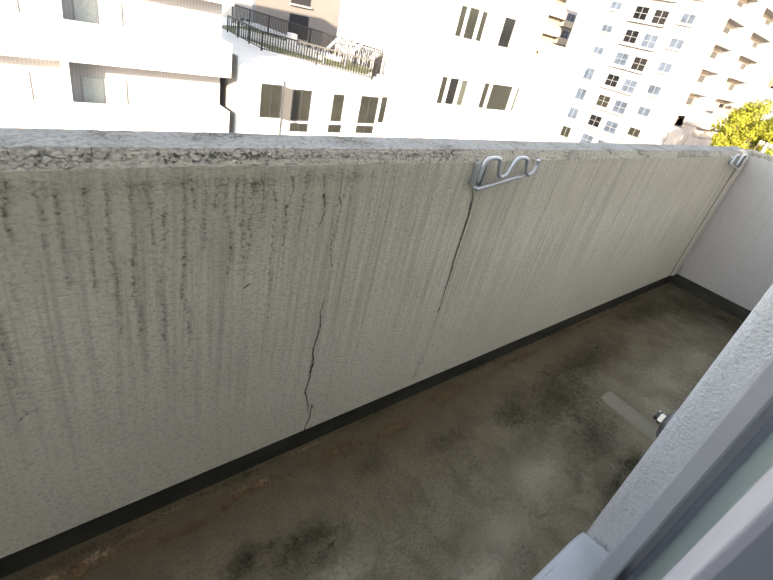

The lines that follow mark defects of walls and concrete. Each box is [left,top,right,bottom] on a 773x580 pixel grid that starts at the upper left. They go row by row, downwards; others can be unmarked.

crack [438,188,473,312]
crack [304,296,326,430]
water stain [635,347,716,420]
water stain [442,448,569,580]